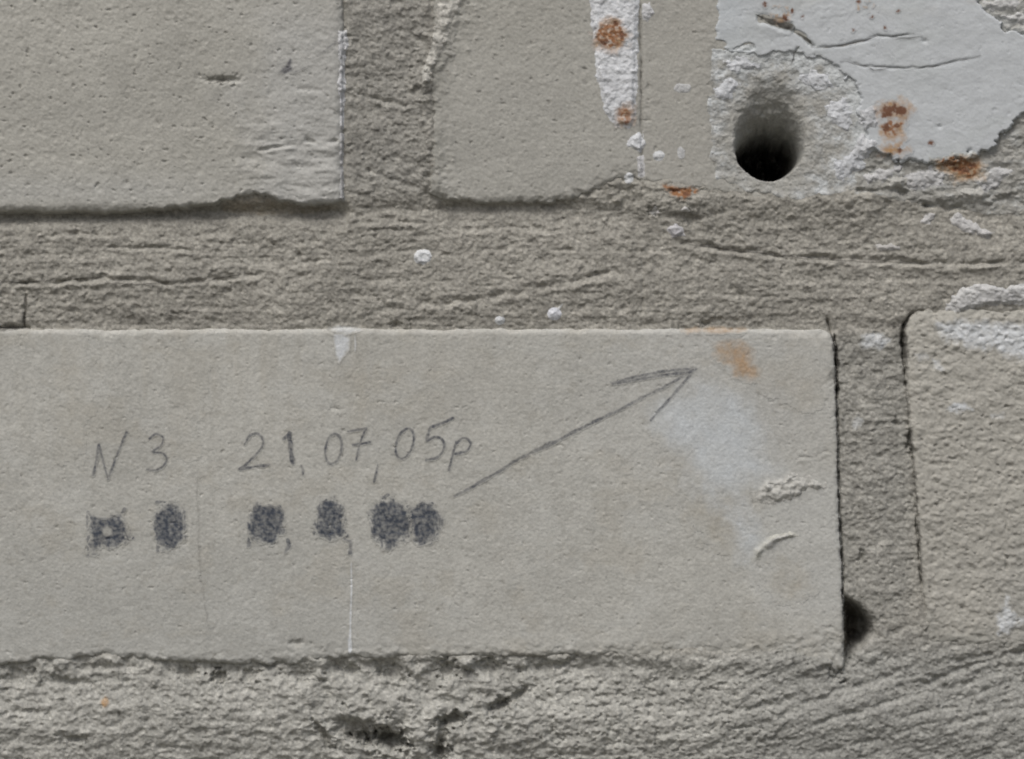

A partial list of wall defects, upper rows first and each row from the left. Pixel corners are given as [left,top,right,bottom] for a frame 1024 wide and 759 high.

rust [588,14,634,58]
crack [790,31,982,72]
rust [612,100,638,129]
peeling [707,0,1024,224]
rust [872,93,919,161]
rust [926,139,990,188]
crack [888,306,933,602]